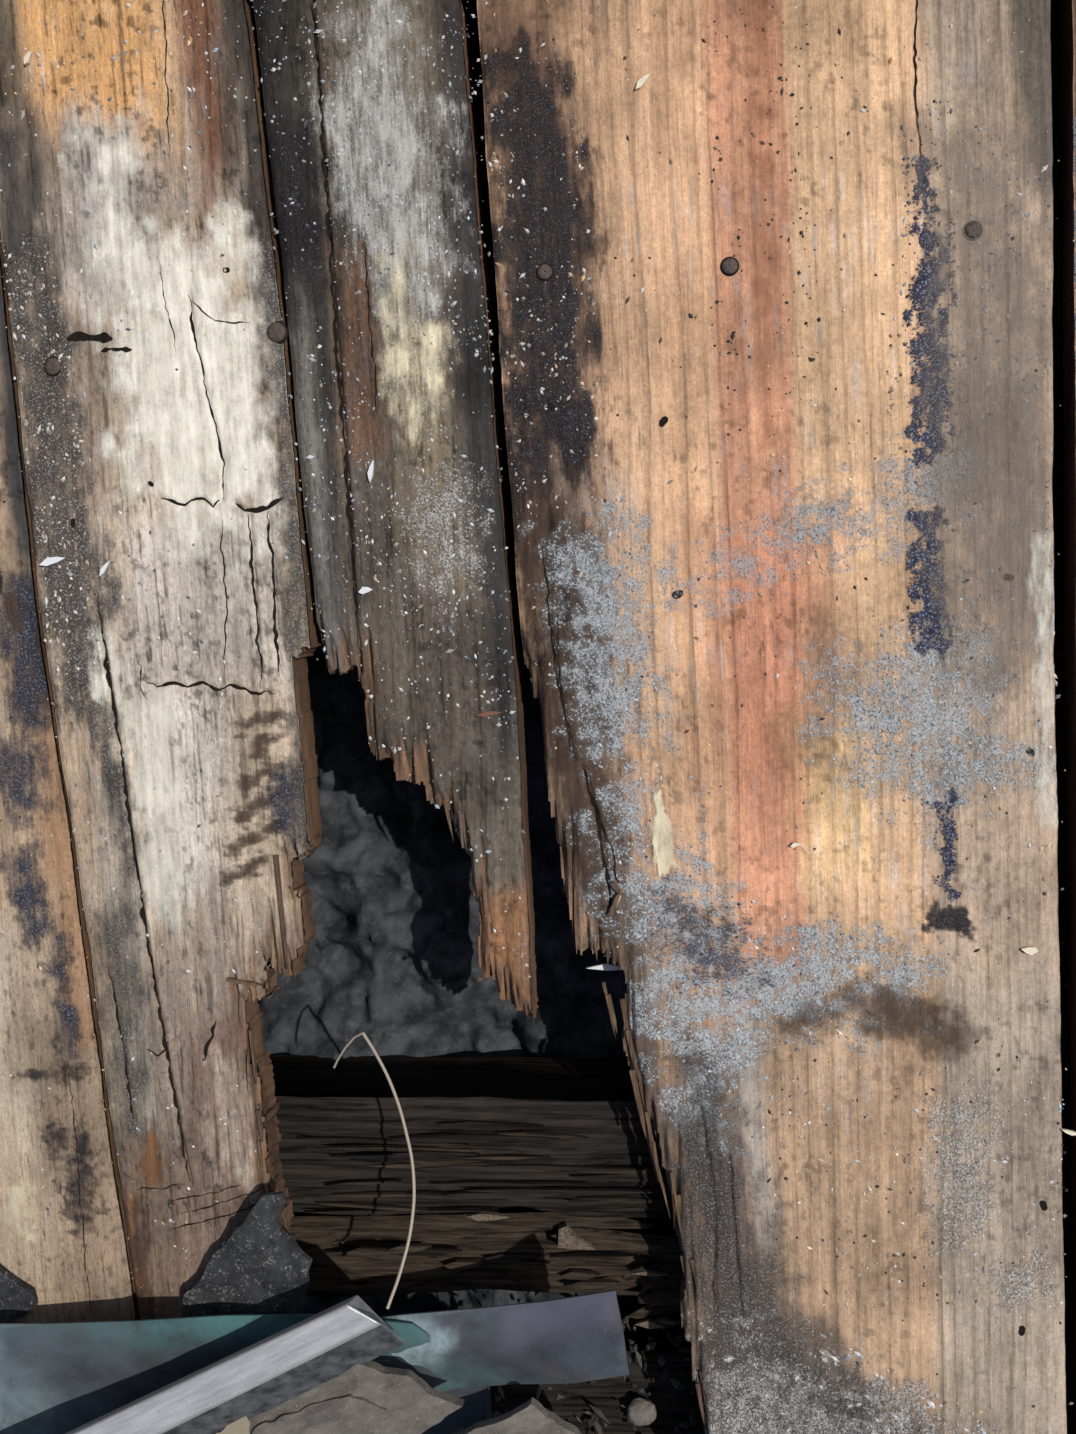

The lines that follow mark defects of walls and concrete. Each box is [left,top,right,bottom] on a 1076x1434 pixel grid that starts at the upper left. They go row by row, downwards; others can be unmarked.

leakage [0,843,83,1081]
leakage [0,232,177,912]
crack [67,331,132,352]
crack [95,258,283,1230]
leakage [221,711,310,885]
leakage [91,0,464,679]
leakage [390,28,632,941]
leakage [630,877,775,999]
leakage [926,788,968,906]
leakage [886,139,1051,668]
leakage [46,1125,99,1234]
leakage [671,1088,875,1434]